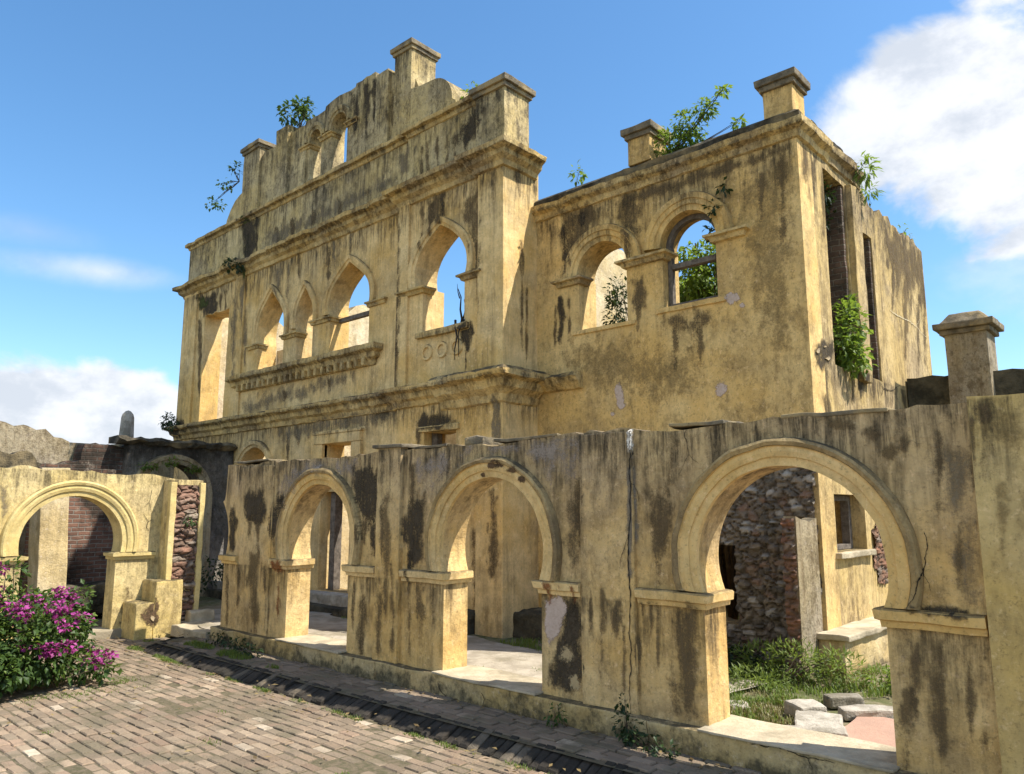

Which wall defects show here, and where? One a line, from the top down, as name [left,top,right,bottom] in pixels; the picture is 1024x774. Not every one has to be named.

damp [553,204,594,344]
damp [618,143,788,345]
damp [567,312,709,398]
damp [225,464,322,638]
damp [336,453,447,660]
damp [472,489,498,578]
crack [620,431,639,724]
damp [645,480,672,574]
crack [906,533,931,609]
spalling [545,595,585,692]
damp [898,640,947,756]